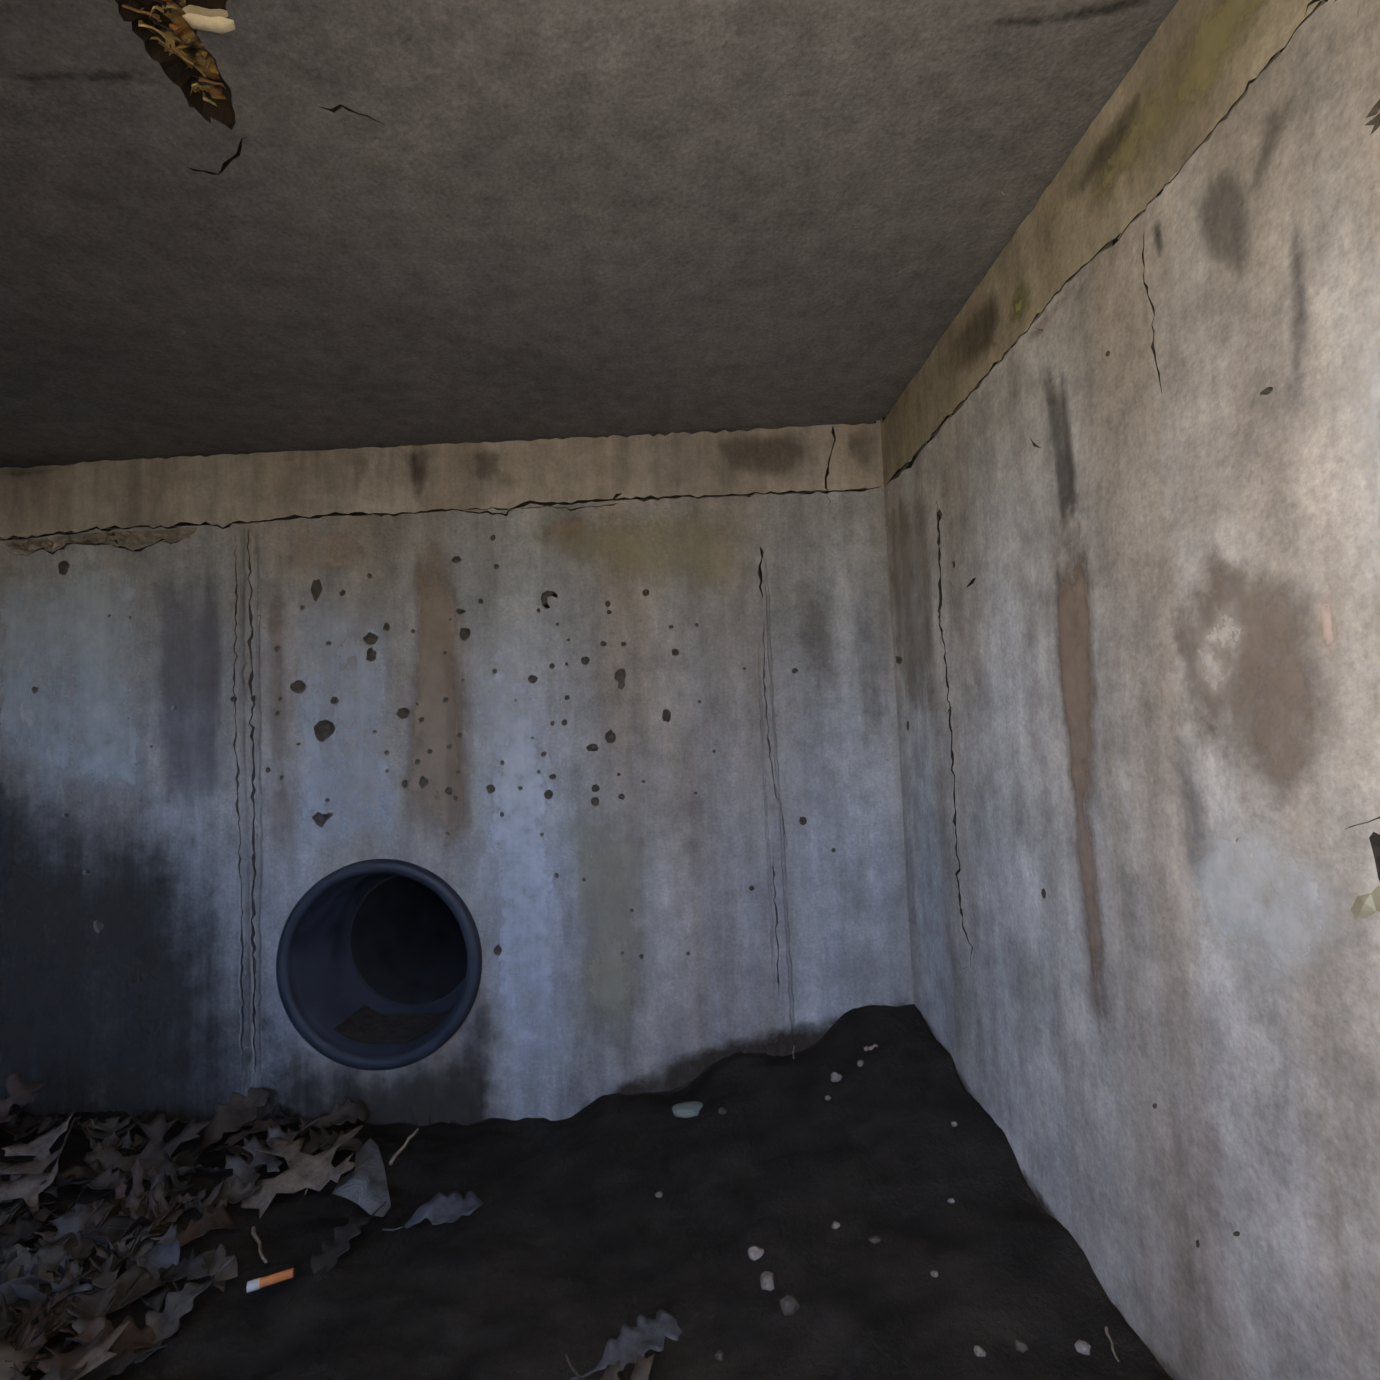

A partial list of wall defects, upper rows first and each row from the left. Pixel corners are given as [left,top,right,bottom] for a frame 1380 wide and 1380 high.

spalling [115,0,236,130]
crack [0,0,1336,1073]
water stain [1048,398,1074,513]
water stain [0,791,244,1123]
water stain [1057,547,1103,1004]
spalling [1351,832,1380,919]